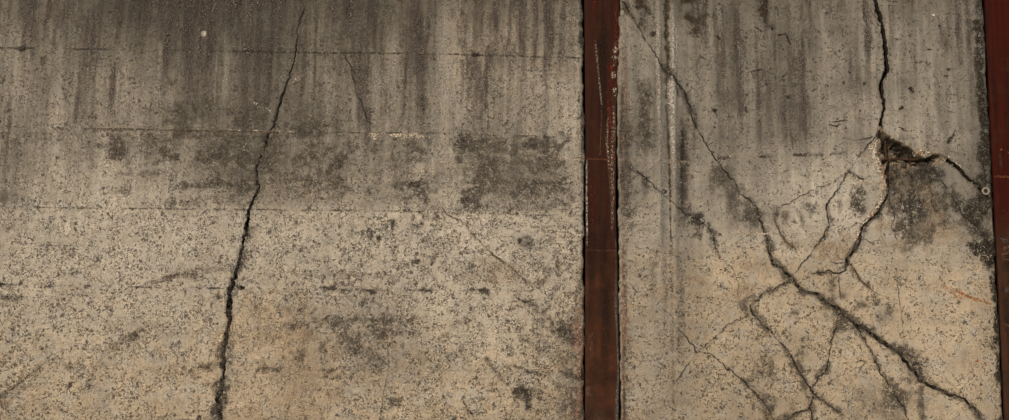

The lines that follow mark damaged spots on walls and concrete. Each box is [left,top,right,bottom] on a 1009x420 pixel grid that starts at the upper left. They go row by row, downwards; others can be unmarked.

water stain [80,0,285,102]
water stain [331,0,430,141]
water stain [458,0,573,129]
water stain [655,0,702,238]
water stain [862,0,871,57]
crack [210,10,304,420]
water stain [710,165,849,258]
crack [622,0,985,420]
spalling [854,126,961,246]
crack [930,153,995,255]